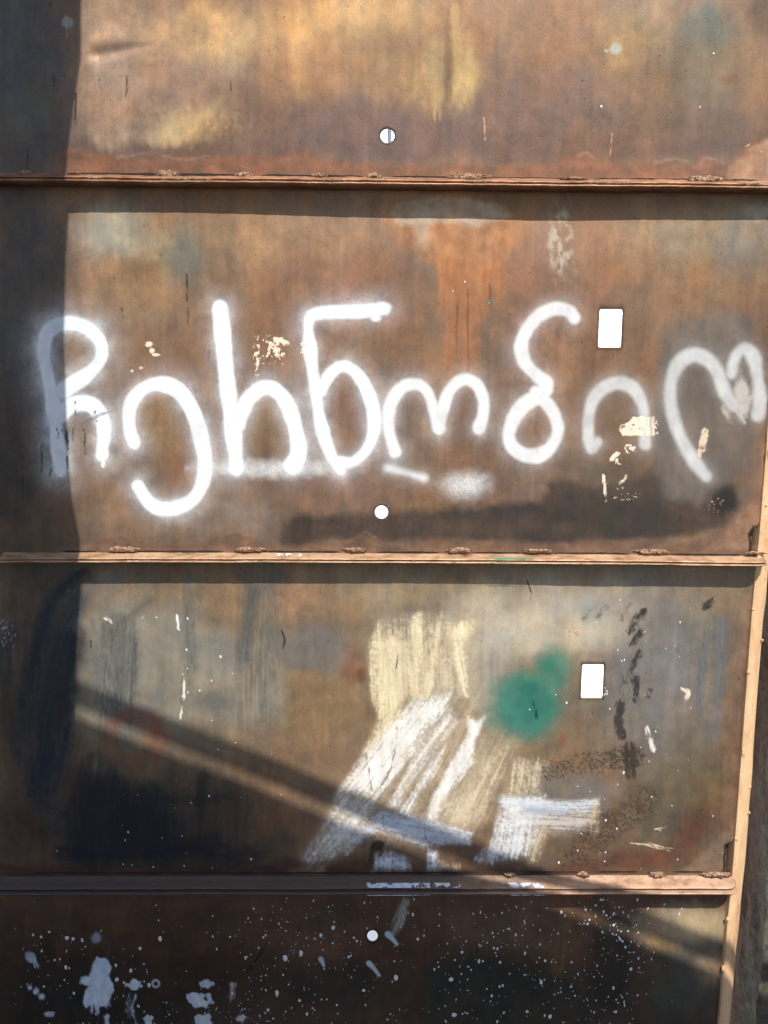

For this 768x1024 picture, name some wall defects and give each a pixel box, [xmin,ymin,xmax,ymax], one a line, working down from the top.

corrosion [723,134,768,181]
corrosion [374,194,531,360]
peeling [252,334,307,377]
peeling [601,415,659,503]
peeling [696,426,710,460]